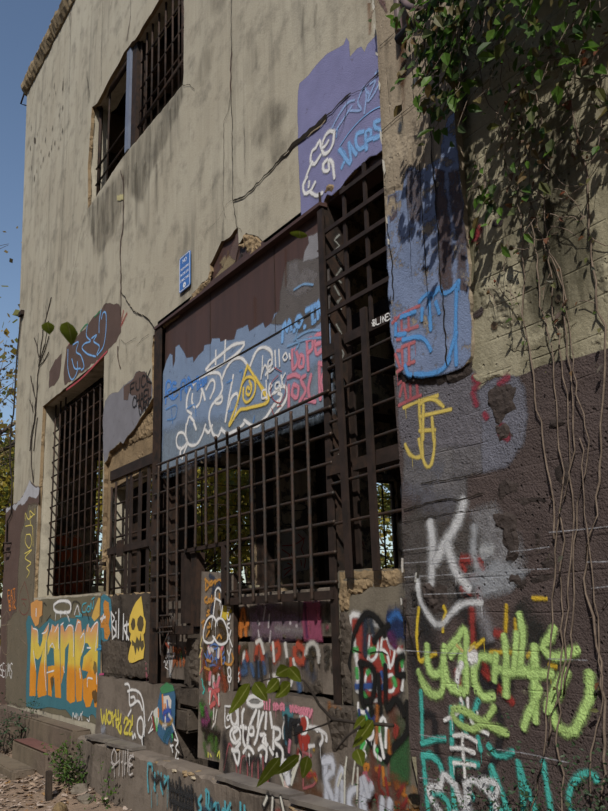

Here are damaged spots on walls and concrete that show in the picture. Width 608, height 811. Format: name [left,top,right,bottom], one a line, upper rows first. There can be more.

crack [112,170,154,368]
spalling [190,232,262,300]
crack [219,40,379,233]
crack [381,39,448,366]
leakage [531,155,568,316]
spalling [397,361,516,441]